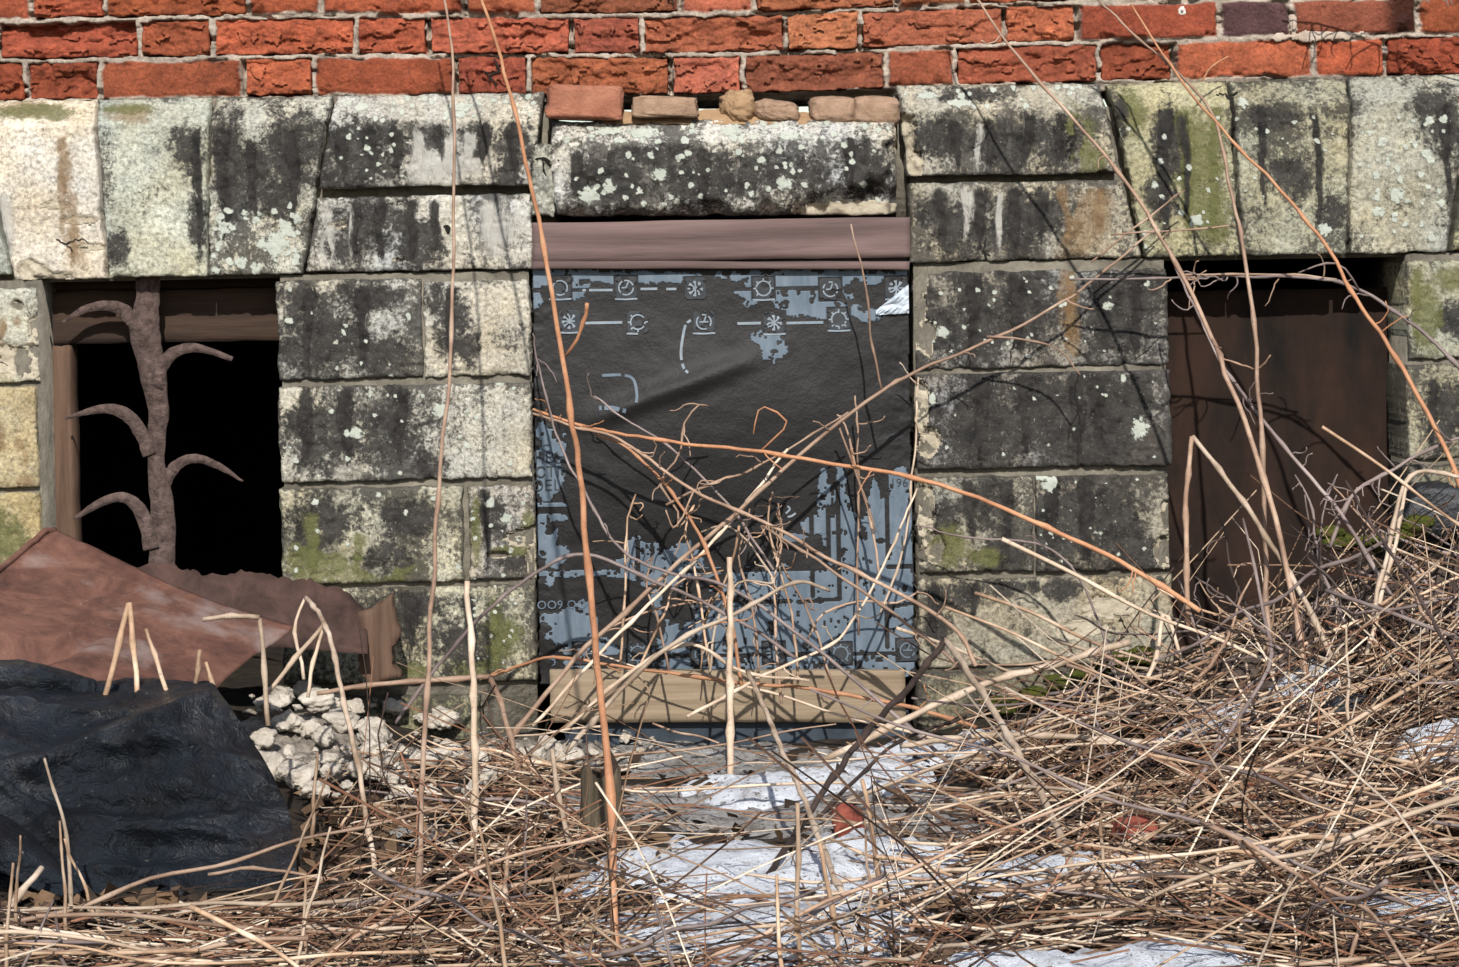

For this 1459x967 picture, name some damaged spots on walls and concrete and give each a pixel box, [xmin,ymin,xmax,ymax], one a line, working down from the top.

spalling [0,0,1171,100]
damp [1139,92,1222,238]
damp [1244,103,1348,237]
damp [1411,80,1459,204]
damp [107,226,131,267]
damp [168,97,536,676]
damp [564,85,1169,652]